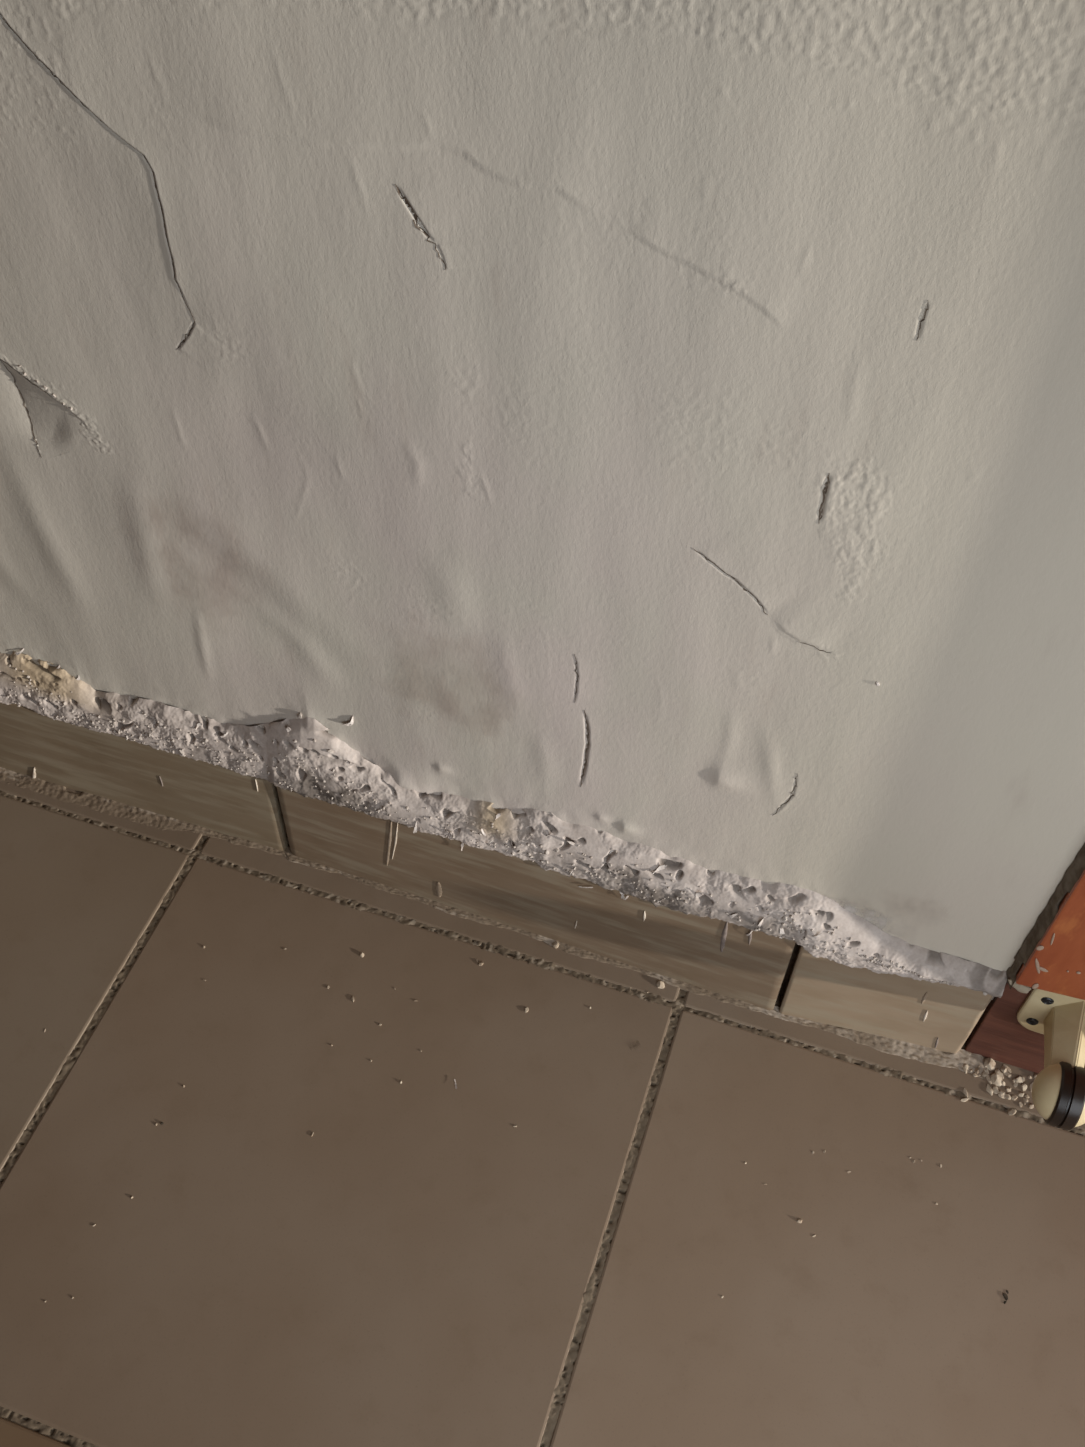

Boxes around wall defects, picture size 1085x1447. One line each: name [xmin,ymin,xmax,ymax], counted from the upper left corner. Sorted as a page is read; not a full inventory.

crack [0,5,204,357]
crack [386,174,454,279]
crack [907,291,940,349]
peeling [0,347,114,479]
crack [681,539,842,660]
crack [568,649,595,792]
spalling [0,648,1007,1000]